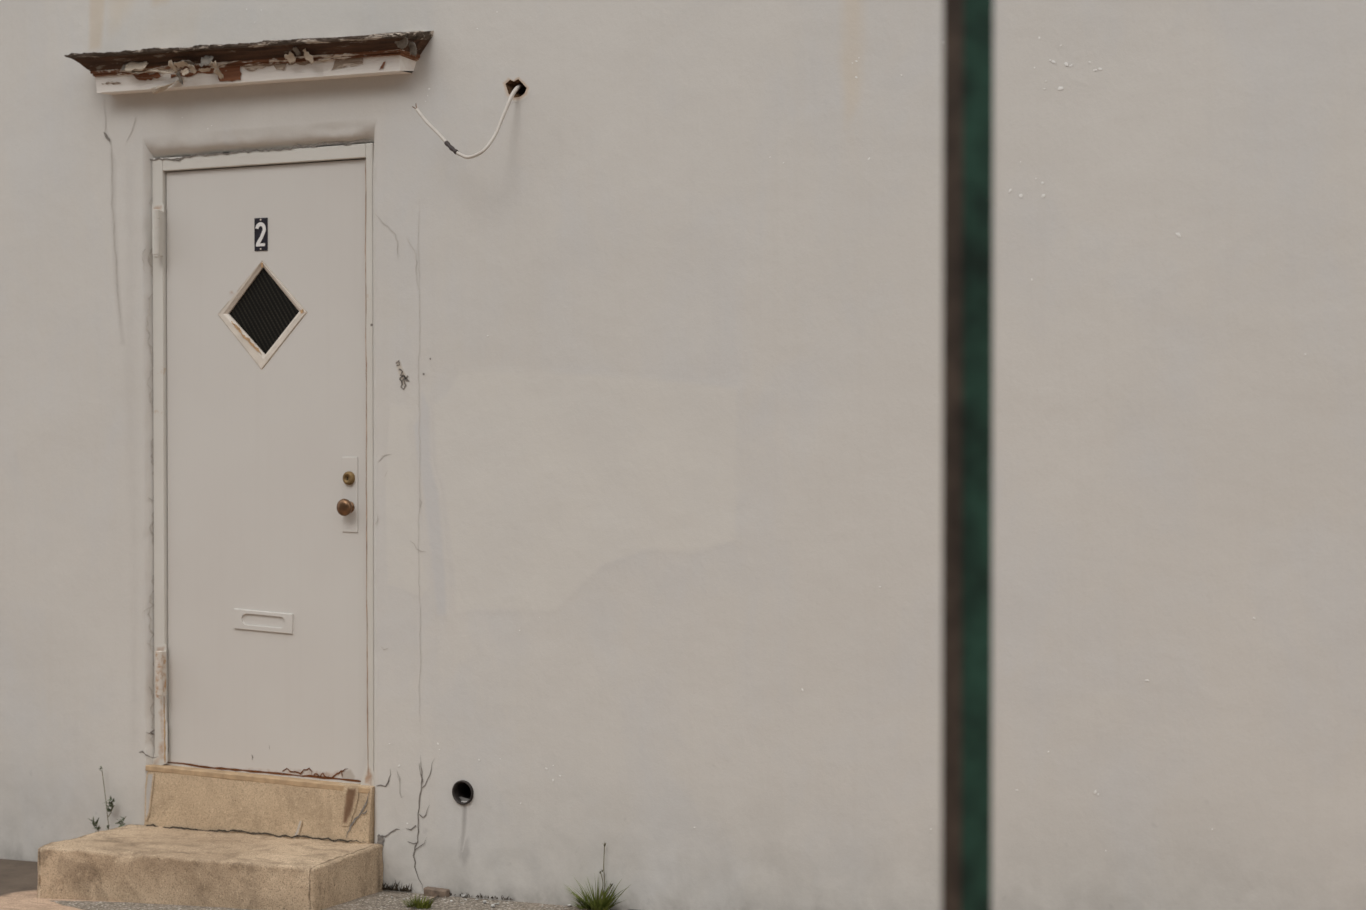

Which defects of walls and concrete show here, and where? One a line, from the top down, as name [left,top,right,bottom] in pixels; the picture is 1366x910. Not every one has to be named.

peeling [102,46,363,94]